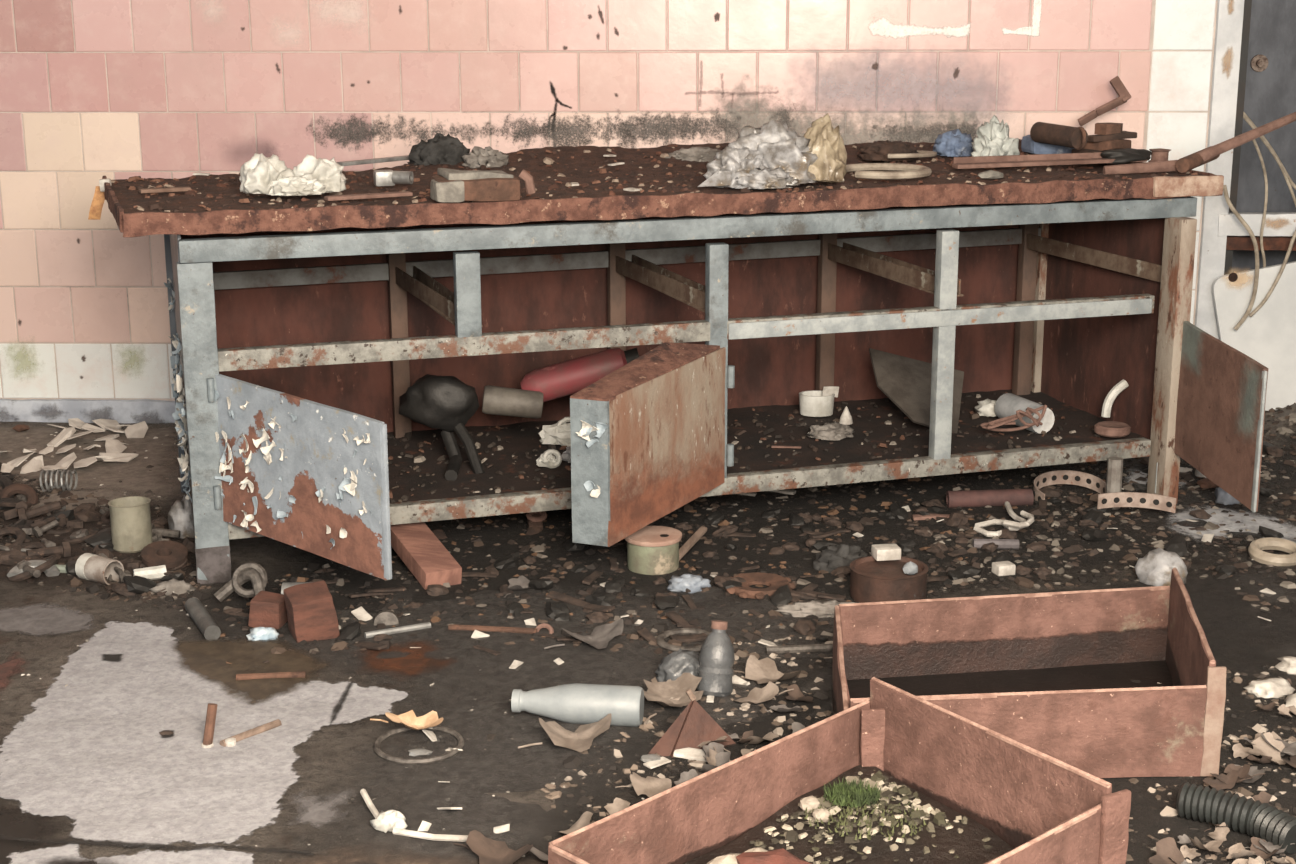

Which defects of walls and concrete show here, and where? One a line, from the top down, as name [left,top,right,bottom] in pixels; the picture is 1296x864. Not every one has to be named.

damp [306,93,812,148]
damp [832,115,977,145]